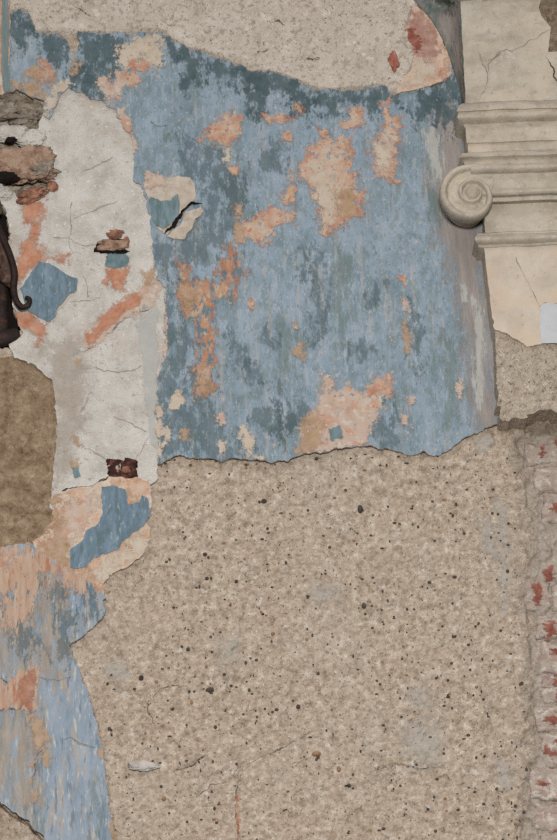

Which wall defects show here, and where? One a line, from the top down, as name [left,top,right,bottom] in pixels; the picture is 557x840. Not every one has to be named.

spalling [539,0,557,52]
crack [479,30,547,99]
peeling [0,0,498,548]
peeling [540,303,557,343]
peeling [0,476,152,840]